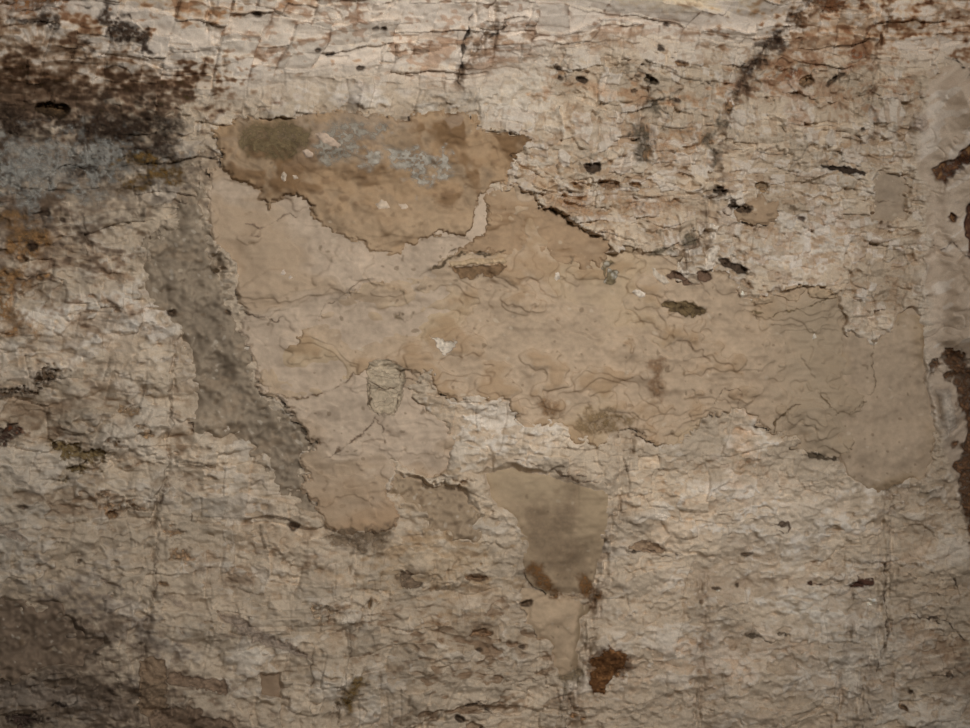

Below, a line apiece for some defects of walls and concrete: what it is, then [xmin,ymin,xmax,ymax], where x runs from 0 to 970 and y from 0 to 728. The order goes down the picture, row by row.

crack [458,15,506,83]
leakage [0,132,123,205]
leakage [314,123,450,185]
spalling [821,165,866,176]
spalling [449,258,507,280]
spalling [652,223,748,285]
spalling [661,301,706,318]
peeling [740,284,838,305]
spalling [431,337,457,356]
spalling [366,359,406,415]
spalling [807,452,836,461]
corrosion [589,645,628,694]